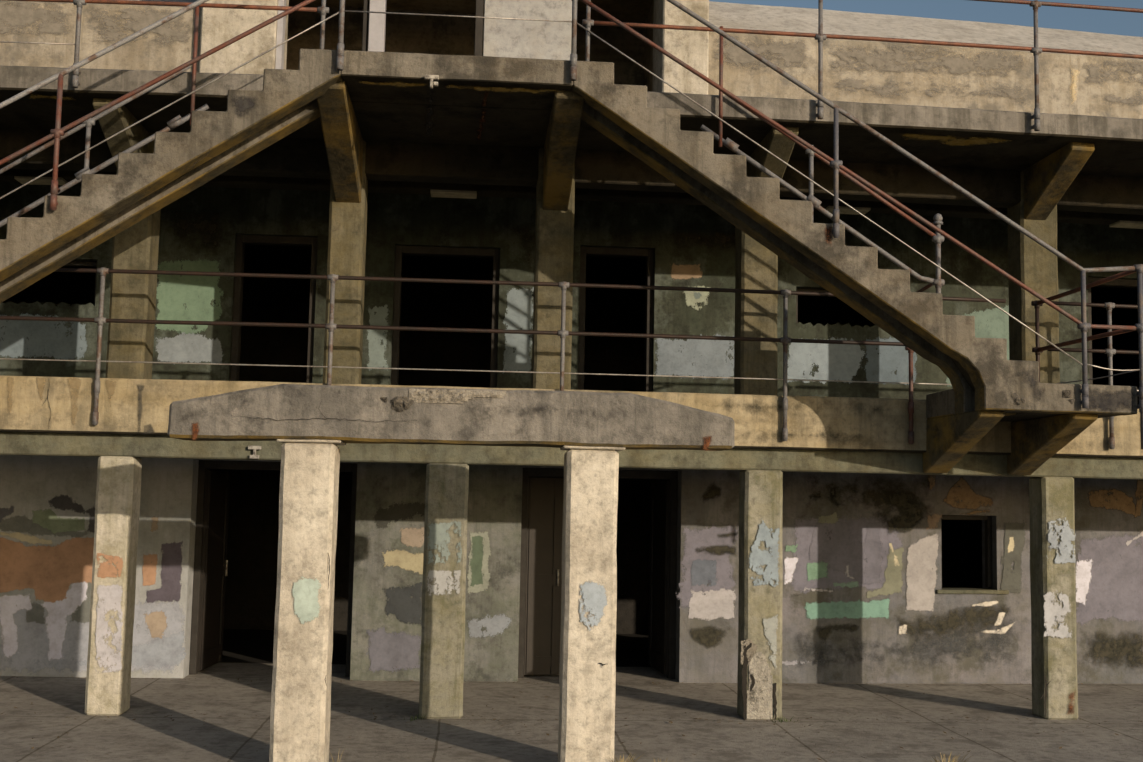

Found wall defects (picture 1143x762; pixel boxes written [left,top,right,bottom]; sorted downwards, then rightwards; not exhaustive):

spalling [381,389,506,412]
damp [810,477,929,533]
peeling [1088,480,1143,517]
damp [1086,633,1143,667]
spalling [741,639,773,719]